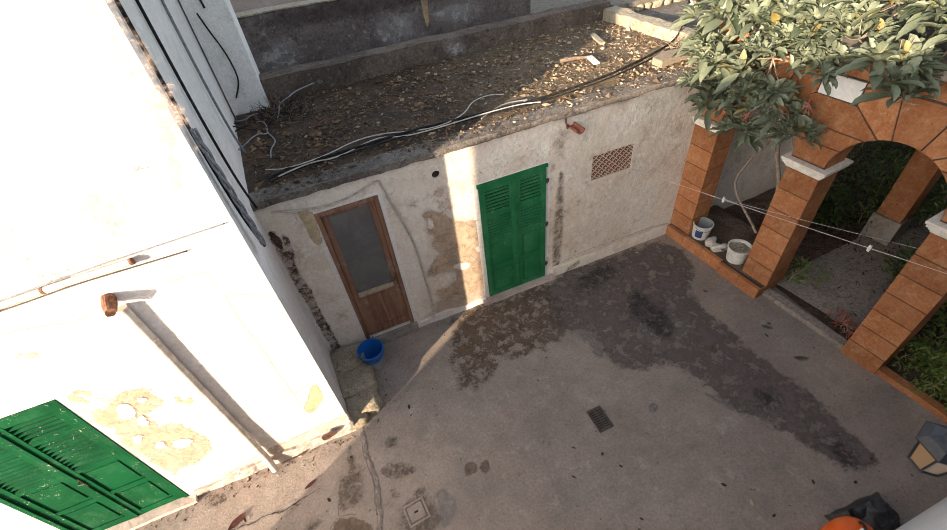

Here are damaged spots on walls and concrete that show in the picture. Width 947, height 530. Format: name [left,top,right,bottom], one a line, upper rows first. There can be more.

flaking render [422,211,484,300]
crack [166,232,340,445]
leakage [437,173,878,470]
flaking render [65,386,212,475]
flaking render [304,385,323,413]
crack [361,426,383,528]